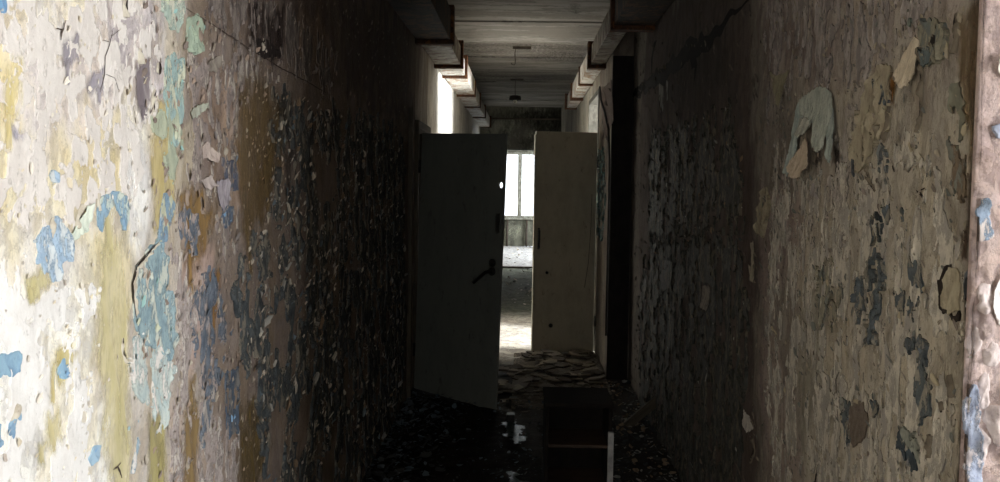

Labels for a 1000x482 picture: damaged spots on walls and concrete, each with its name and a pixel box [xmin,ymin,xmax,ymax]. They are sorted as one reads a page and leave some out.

crack [100,0,130,92]
crack [132,190,206,318]
peeling [0,0,408,482]
peeling [742,0,994,482]